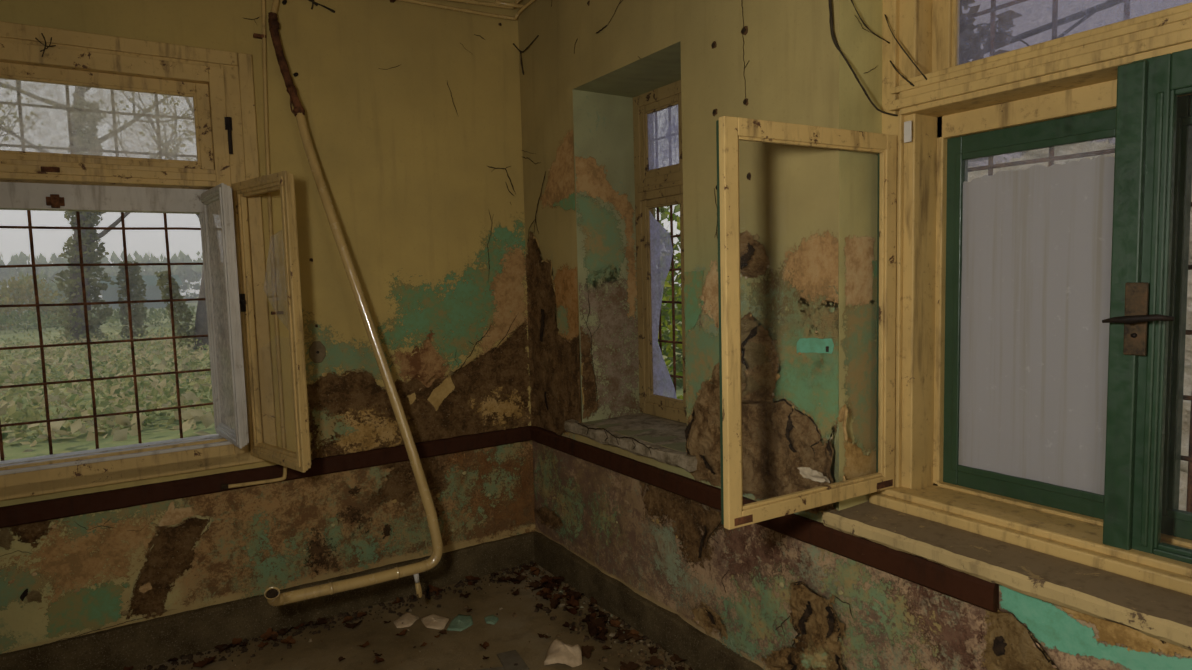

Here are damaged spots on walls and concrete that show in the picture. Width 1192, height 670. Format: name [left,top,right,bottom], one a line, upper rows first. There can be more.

crack [487,150,546,280]
peeling [553,156,638,319]
spalling [302,225,600,460]
spalling [685,321,721,487]
spalling [742,230,877,500]
spalling [0,499,212,621]
spalling [363,442,525,542]
spalling [640,481,735,571]
spalling [691,548,942,670]
spalling [804,503,836,515]
peeling [981,585,1192,670]